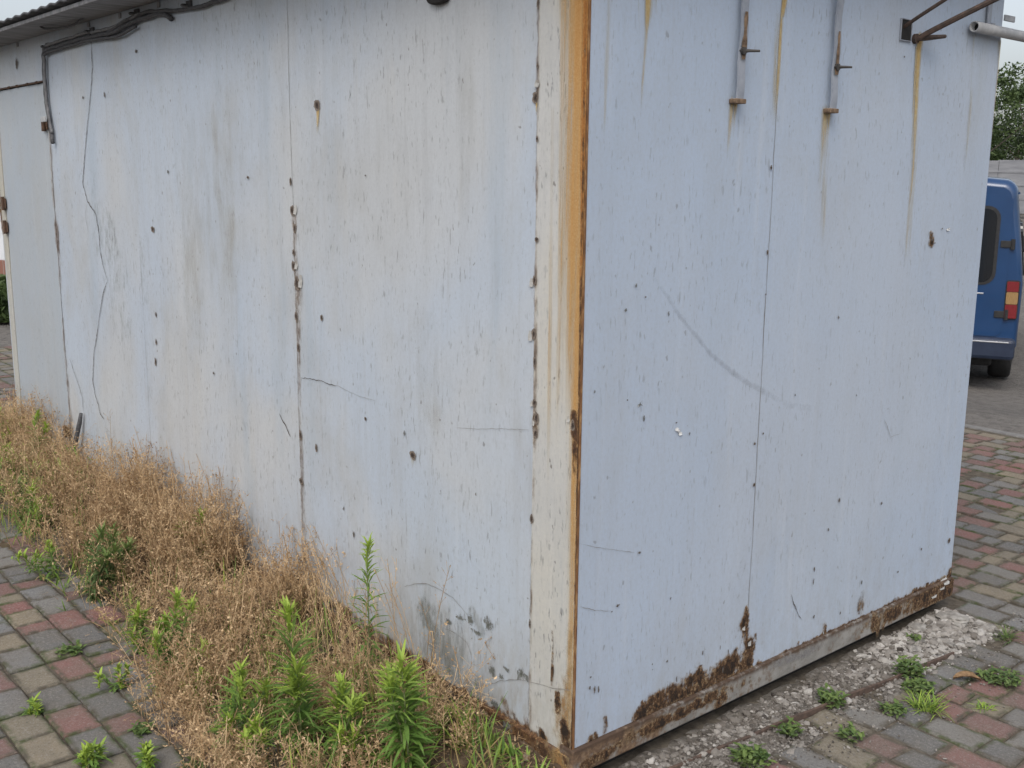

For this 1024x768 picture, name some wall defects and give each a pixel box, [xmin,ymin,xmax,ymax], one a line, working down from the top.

corrosion [580,606,762,768]
corrosion [781,567,954,654]